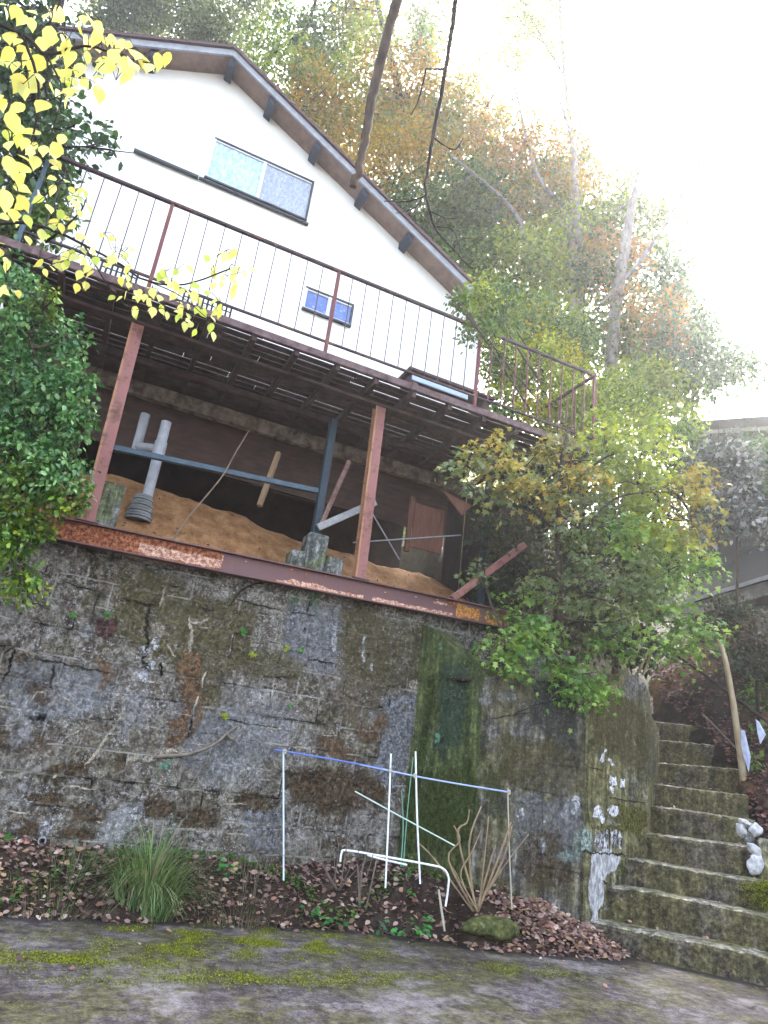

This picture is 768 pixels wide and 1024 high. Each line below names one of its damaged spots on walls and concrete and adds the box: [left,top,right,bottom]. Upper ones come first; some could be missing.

rust [30,513,224,570]
crack [44,561,317,677]
rust [276,569,507,627]
crack [2,646,113,691]
crack [264,659,338,678]
damp [593,748,625,824]